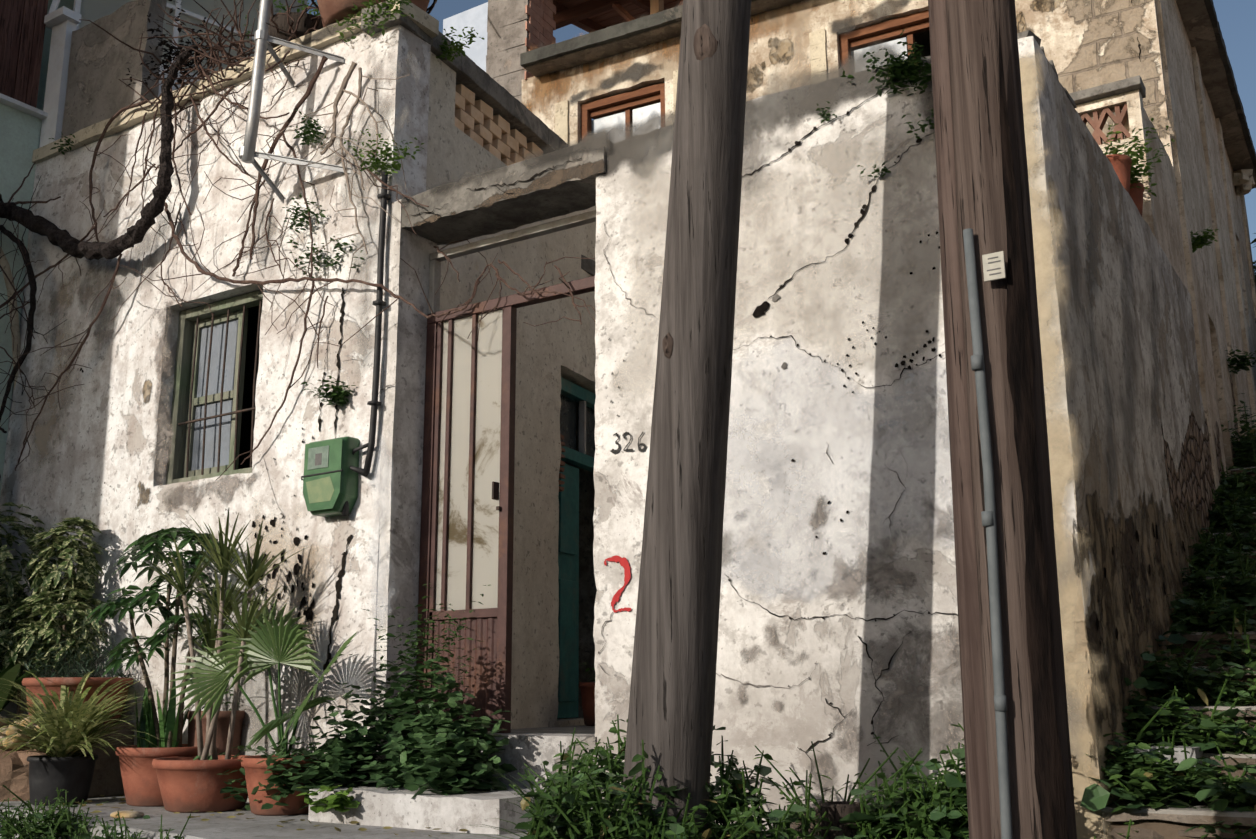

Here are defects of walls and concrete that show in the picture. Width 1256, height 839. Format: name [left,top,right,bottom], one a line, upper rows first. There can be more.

crack [742,80,894,177]
peeling [1016,0,1174,138]
peeling [1086,110,1125,144]
crack [767,133,933,301]
crack [733,335,944,388]
crack [323,535,353,675]
crack [716,572,958,784]
peeling [1072,490,1203,767]